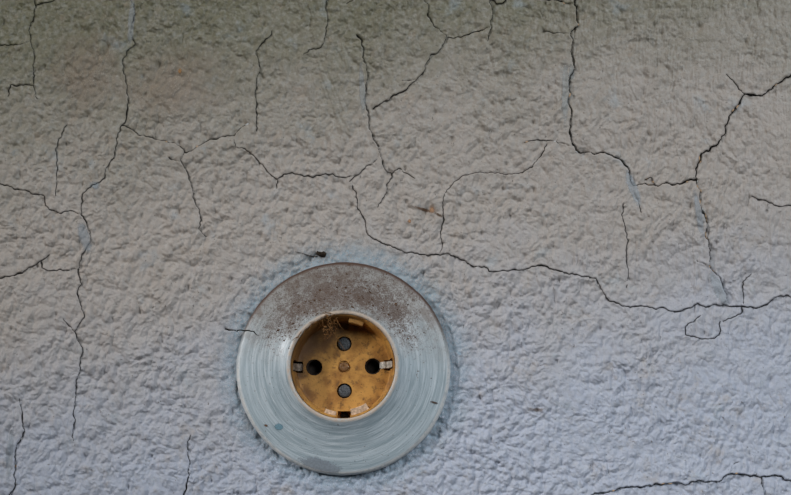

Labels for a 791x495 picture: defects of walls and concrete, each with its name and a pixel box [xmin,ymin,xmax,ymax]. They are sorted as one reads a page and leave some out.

crack [0,0,558,441]
crack [526,0,791,339]
crack [9,398,25,495]
crack [594,462,790,495]